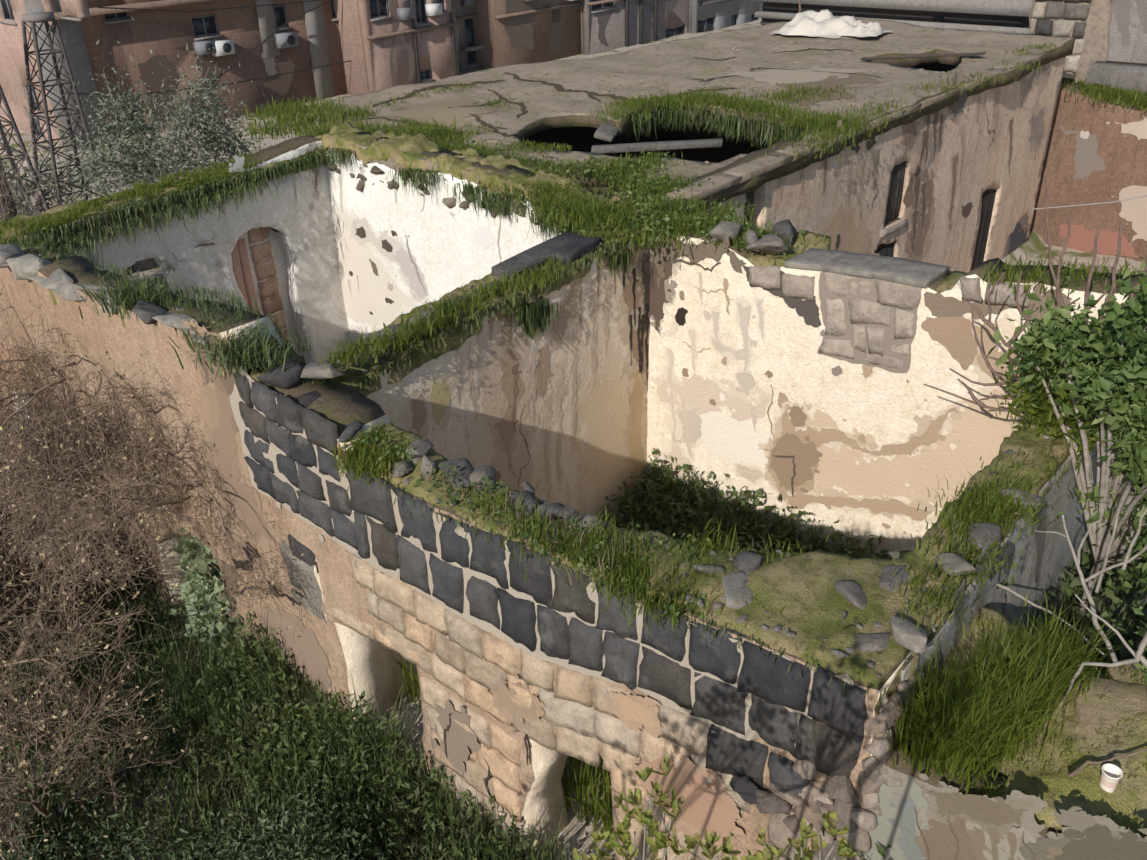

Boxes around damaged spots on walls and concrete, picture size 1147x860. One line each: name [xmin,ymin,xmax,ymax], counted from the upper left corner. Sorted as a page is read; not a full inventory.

crack [356,72,630,136]
crack [673,48,882,97]
leakage [897,61,1106,261]
leakage [1106,116,1147,140]
spalling [382,230,397,252]
spalling [650,236,749,288]
leakage [1059,185,1147,259]
spalling [675,291,687,326]
flaking render [762,270,1072,379]
leakage [402,234,1033,533]
peeling [699,387,822,493]
crack [767,386,796,497]